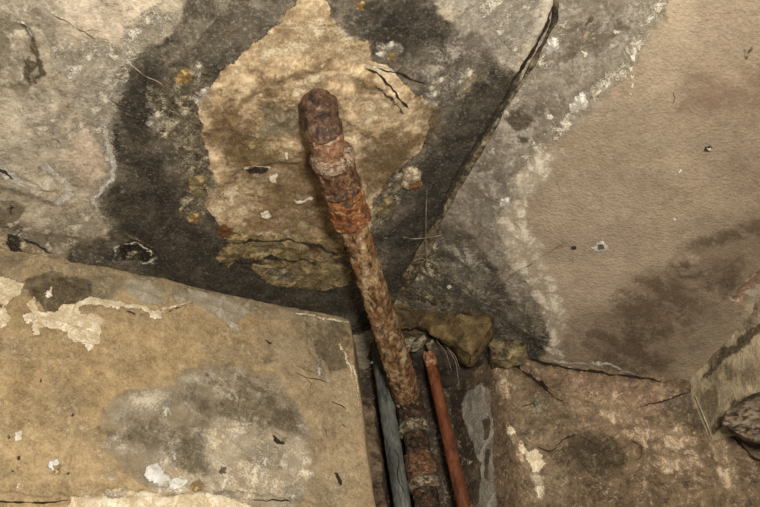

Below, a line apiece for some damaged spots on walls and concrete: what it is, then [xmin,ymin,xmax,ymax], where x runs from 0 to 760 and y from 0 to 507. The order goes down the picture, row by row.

damp [0,0,371,335]
spalling [145,0,439,291]
crack [365,68,425,109]
crack [437,6,553,215]
damp [326,0,668,359]
peeling [0,276,24,330]
peeling [22,296,193,351]
damp [97,363,314,507]
crack [515,358,690,407]
damp [703,324,760,380]